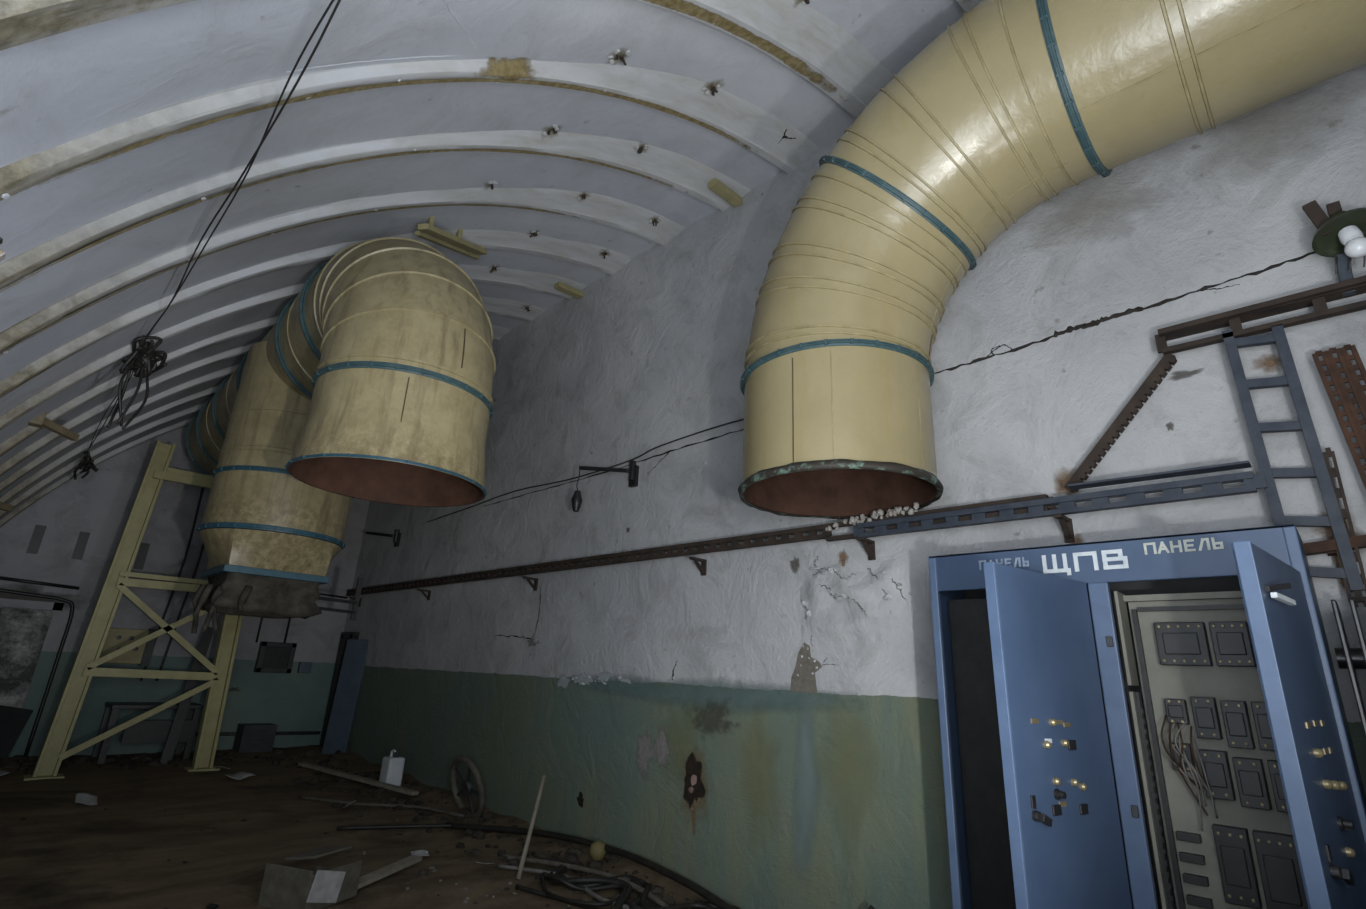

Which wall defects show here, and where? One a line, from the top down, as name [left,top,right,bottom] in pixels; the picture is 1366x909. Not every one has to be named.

crack [934,252,1315,374]
peeling [557,636,838,709]
spalling [683,752,706,835]